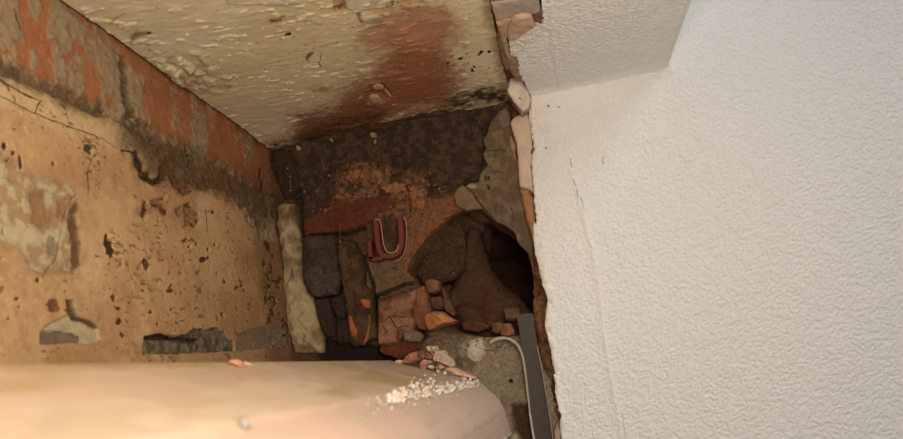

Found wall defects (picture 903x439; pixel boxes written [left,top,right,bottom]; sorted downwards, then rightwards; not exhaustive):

crack [0,79,140,192]
rust [268,0,458,150]
peeling [0,143,79,283]
peeling [348,314,358,337]
spalling [358,78,566,439]